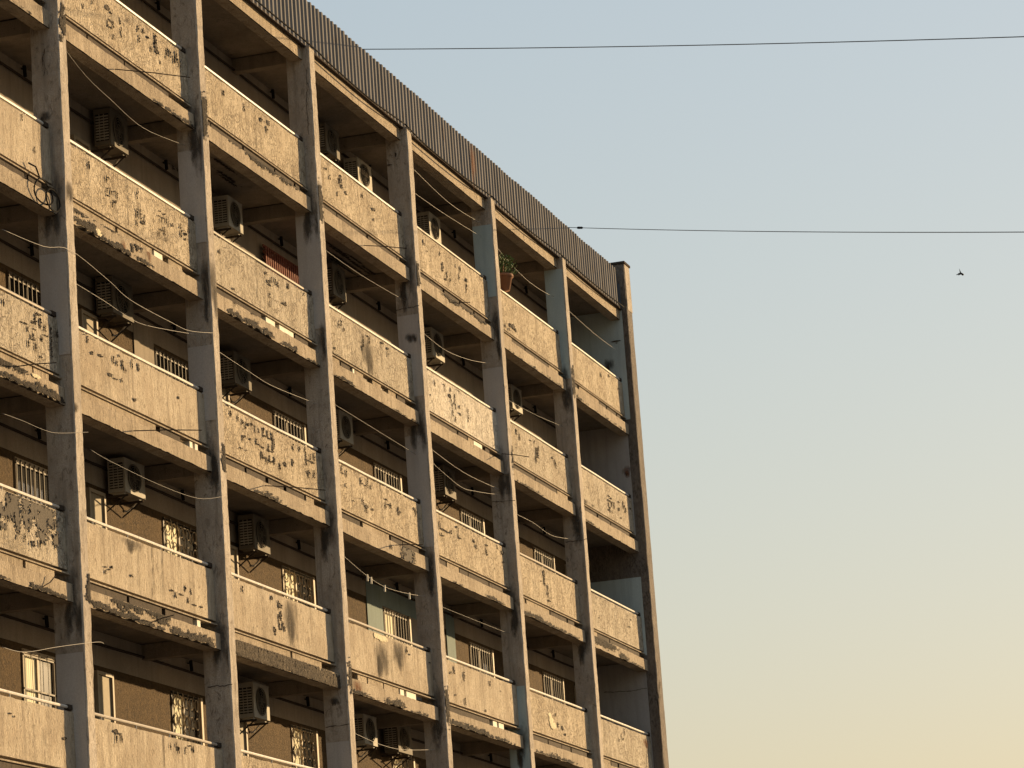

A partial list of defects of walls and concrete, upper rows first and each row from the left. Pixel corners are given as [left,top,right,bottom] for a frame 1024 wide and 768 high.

peeling [137,26,181,68]
damp [189,108,202,159]
spalling [73,207,155,267]
peeling [230,410,315,479]
peeling [0,492,61,549]
spalling [85,573,216,648]